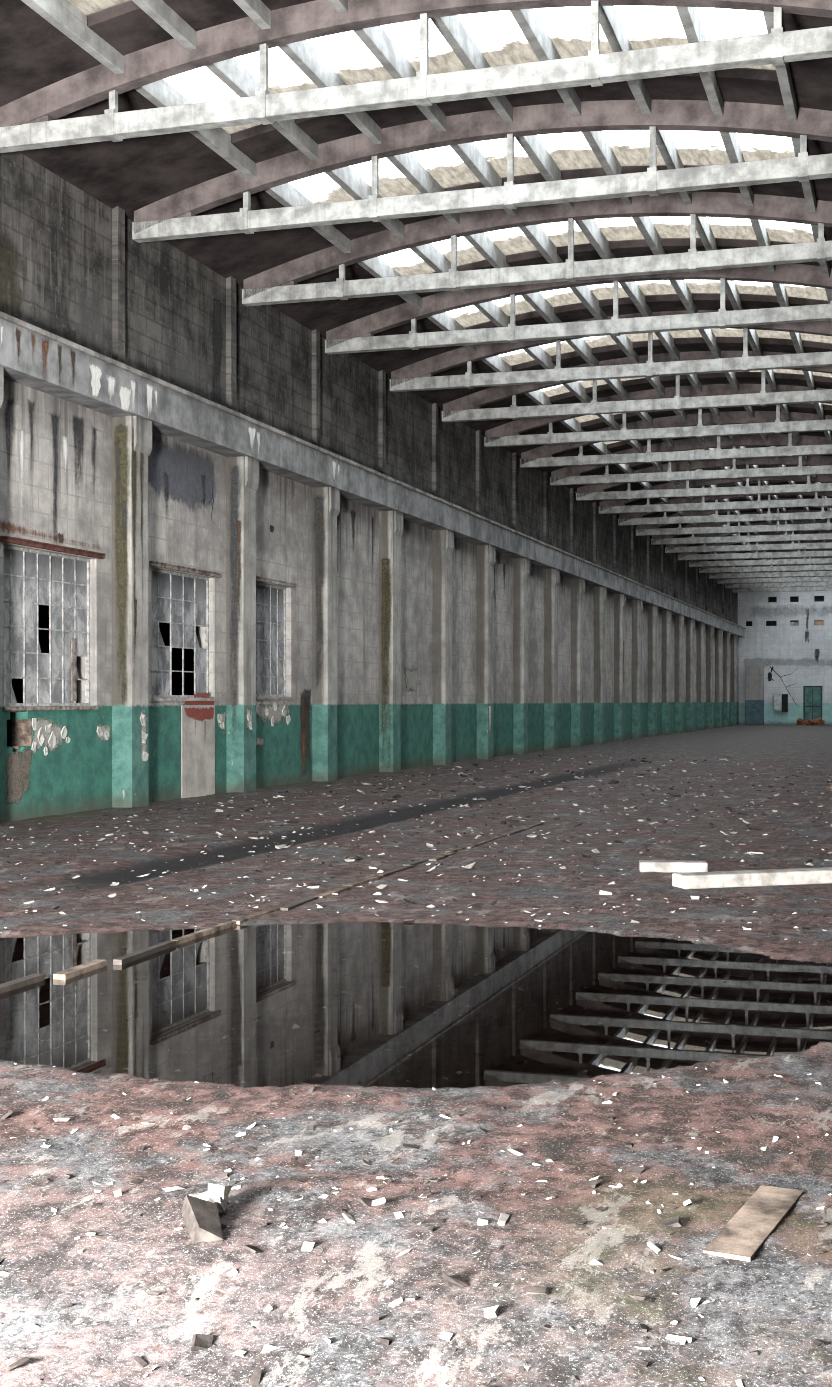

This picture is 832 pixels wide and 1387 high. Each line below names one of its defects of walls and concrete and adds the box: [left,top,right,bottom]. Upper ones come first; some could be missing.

leakage [213,299,240,401]
leakage [89,364,157,415]
corrosion [0,521,64,543]
peeling [217,712,226,731]
peeling [246,702,291,746]
spalling [6,711,70,804]